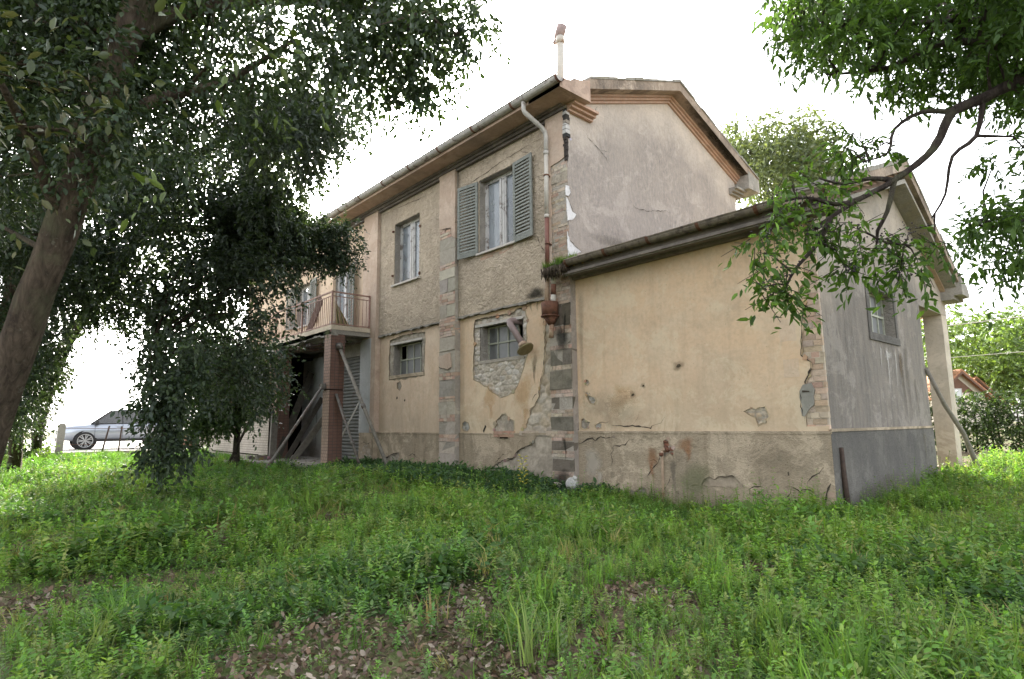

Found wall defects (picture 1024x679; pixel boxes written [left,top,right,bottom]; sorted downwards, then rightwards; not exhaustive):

flaking render [565,185,581,256]
flaking render [473,305,529,398]
crack [485,440,535,470]
flaking render [483,321,553,479]
crack [582,418,663,465]
flaking render [744,405,771,427]